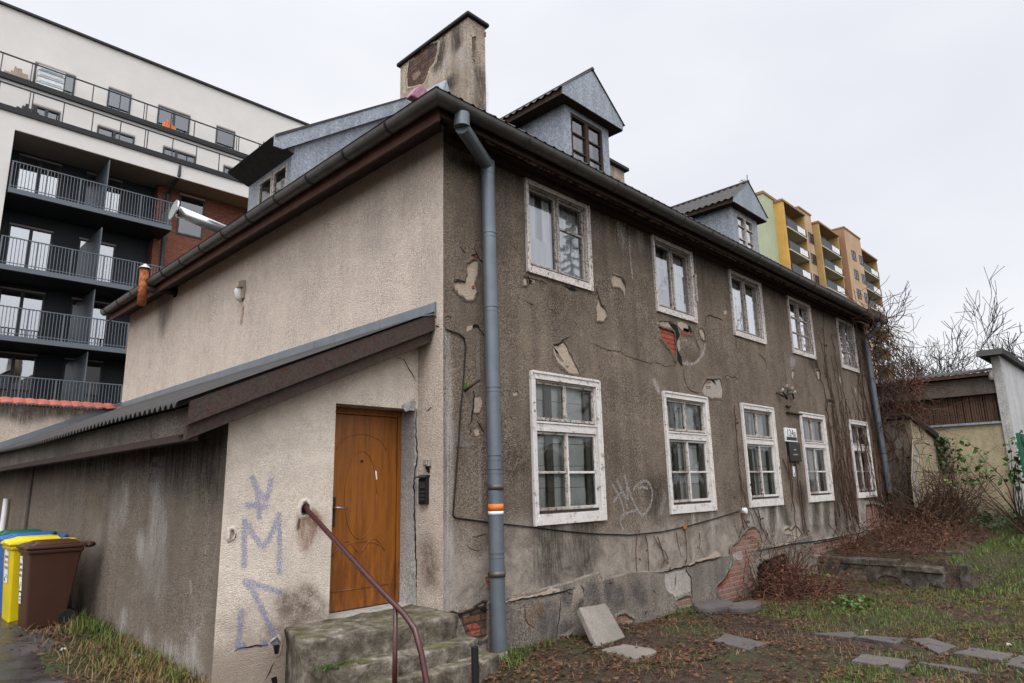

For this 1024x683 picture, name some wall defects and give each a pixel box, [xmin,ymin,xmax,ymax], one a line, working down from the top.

flaking render [406,33,446,90]
peeling [451,254,481,303]
peeling [594,288,608,324]
peeling [610,272,627,300]
peeling [550,336,582,377]
flaking render [656,321,706,366]
peeling [700,376,724,401]
flaking render [450,573,490,646]
peeling [665,570,694,610]
crack [653,551,722,598]
flaking render [715,525,791,601]